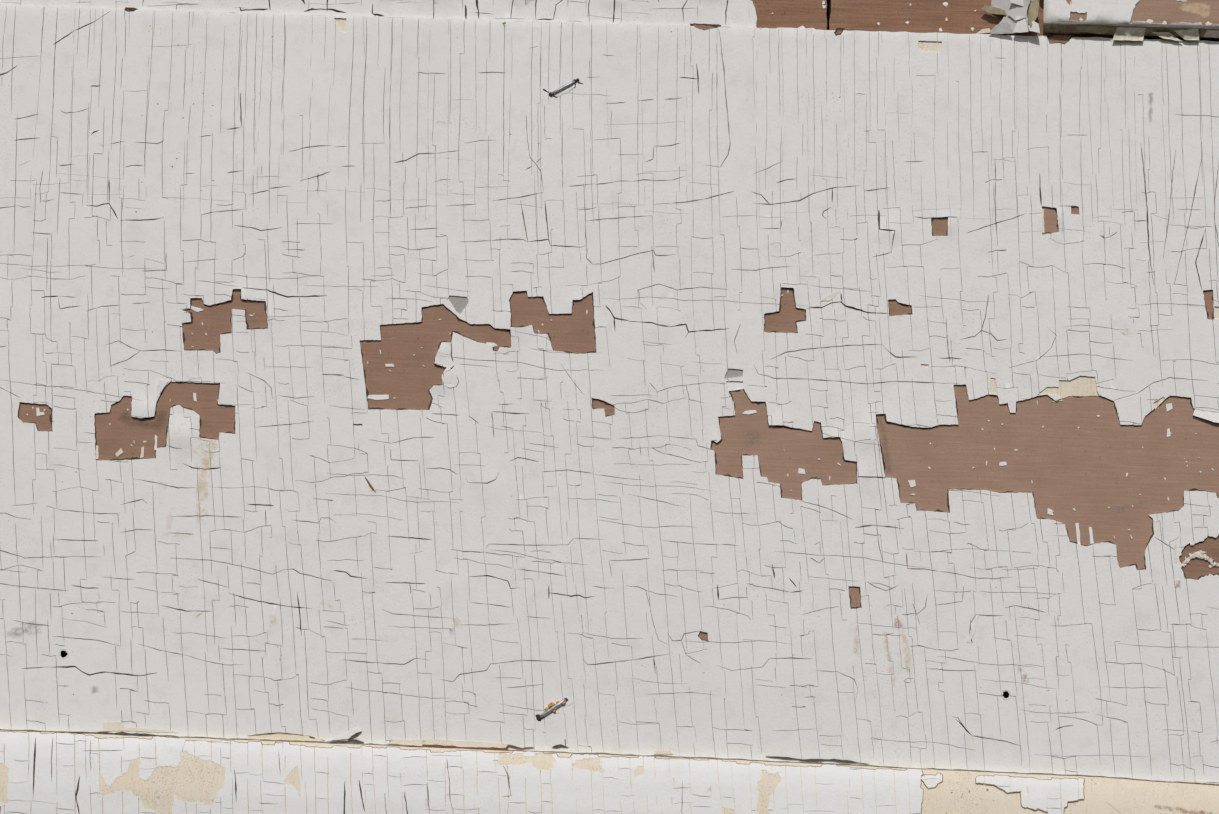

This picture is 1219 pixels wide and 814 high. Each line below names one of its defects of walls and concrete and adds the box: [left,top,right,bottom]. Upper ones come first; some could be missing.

peeling [751,0,1112,53]
crack [405,0,1042,272]
crack [1101,148,1219,289]
peeling [181,289,268,354]
peeling [360,291,596,410]
crack [756,294,1006,384]
peeling [94,380,236,462]
crack [0,446,332,591]
peeling [710,369,857,500]
peeling [876,376,1219,571]
crack [161,569,442,630]
crack [765,756,869,765]